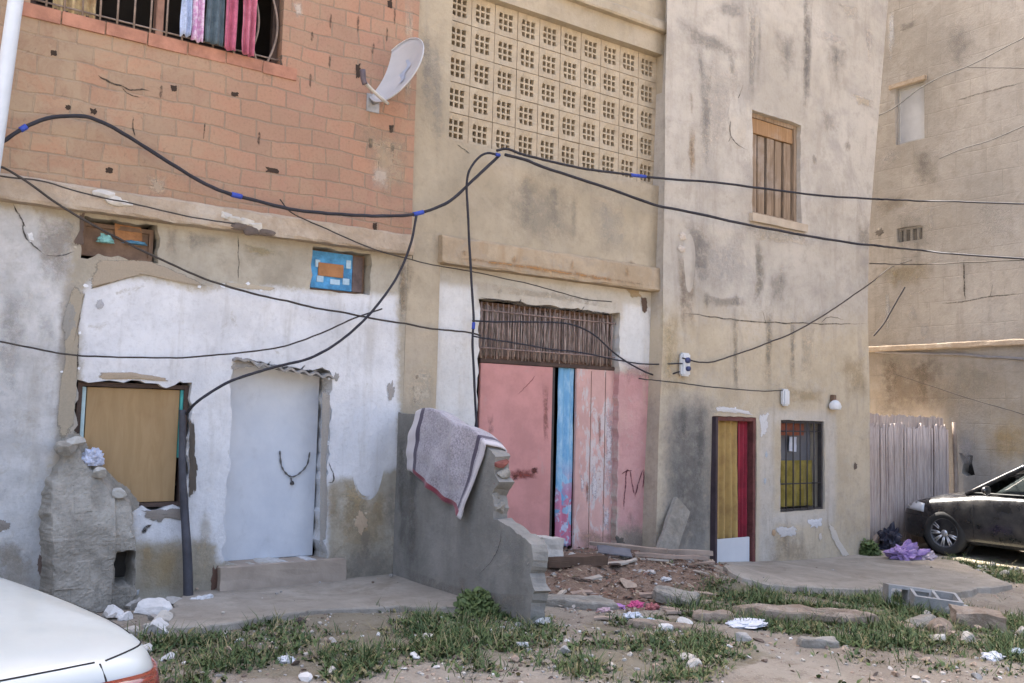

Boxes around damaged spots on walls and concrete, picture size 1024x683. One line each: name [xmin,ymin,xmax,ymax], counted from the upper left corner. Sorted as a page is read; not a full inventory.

crack [14,206,72,256]
spalling [221,211,276,236]
peeling [57,260,201,437]
peeling [347,487,368,535]
flaking render [772,526,797,538]